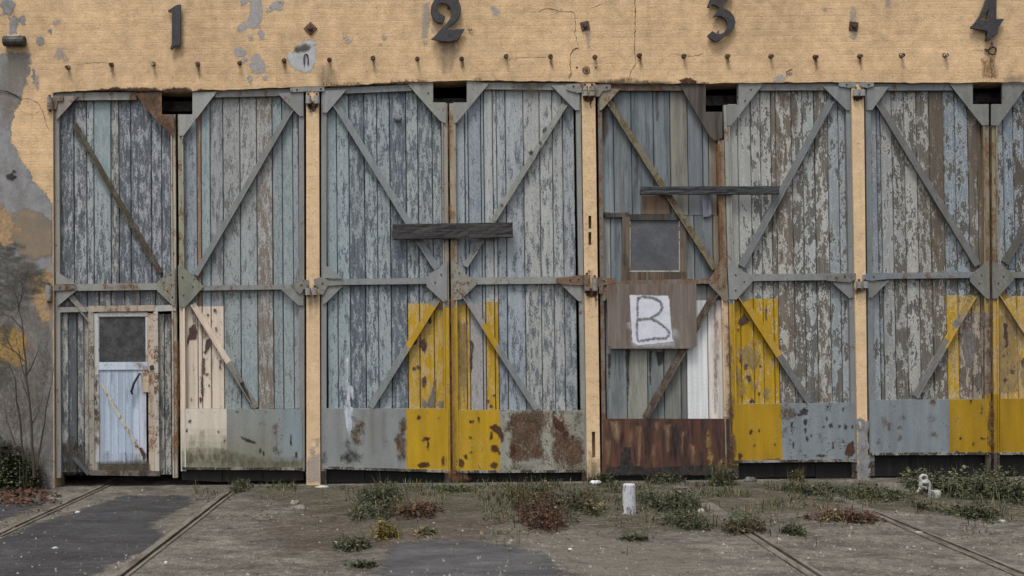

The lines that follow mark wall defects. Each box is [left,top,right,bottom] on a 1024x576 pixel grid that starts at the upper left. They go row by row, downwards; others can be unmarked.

flaking render [0,0,25,35]
peeling [234,0,284,85]
spalling [287,40,316,73]
flaking render [0,50,53,488]